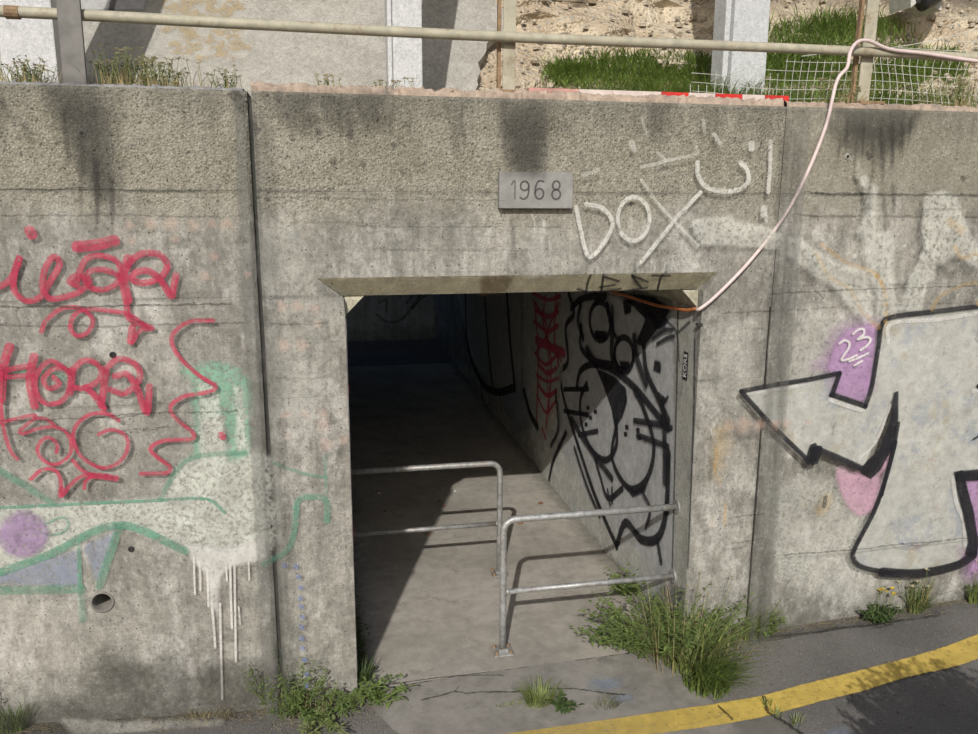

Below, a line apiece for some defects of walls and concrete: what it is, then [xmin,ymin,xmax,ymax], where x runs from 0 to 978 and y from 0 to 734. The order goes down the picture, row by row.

water stain [51,87,100,198]
water stain [838,111,917,162]
crack [385,674,626,700]